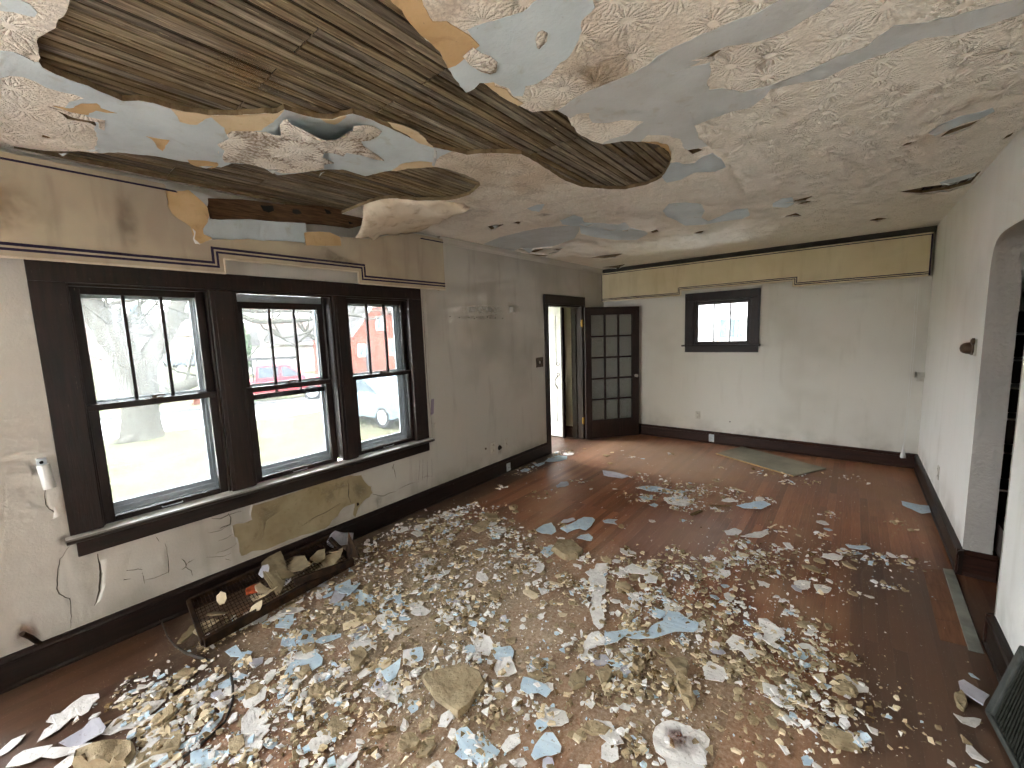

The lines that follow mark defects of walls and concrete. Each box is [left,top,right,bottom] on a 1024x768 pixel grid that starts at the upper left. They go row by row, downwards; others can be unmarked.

peeling [0,50,451,176]
peeling [391,0,595,106]
peeling [558,0,1024,183]
peeling [166,190,341,246]
spalling [231,475,373,564]
crack [56,537,192,628]